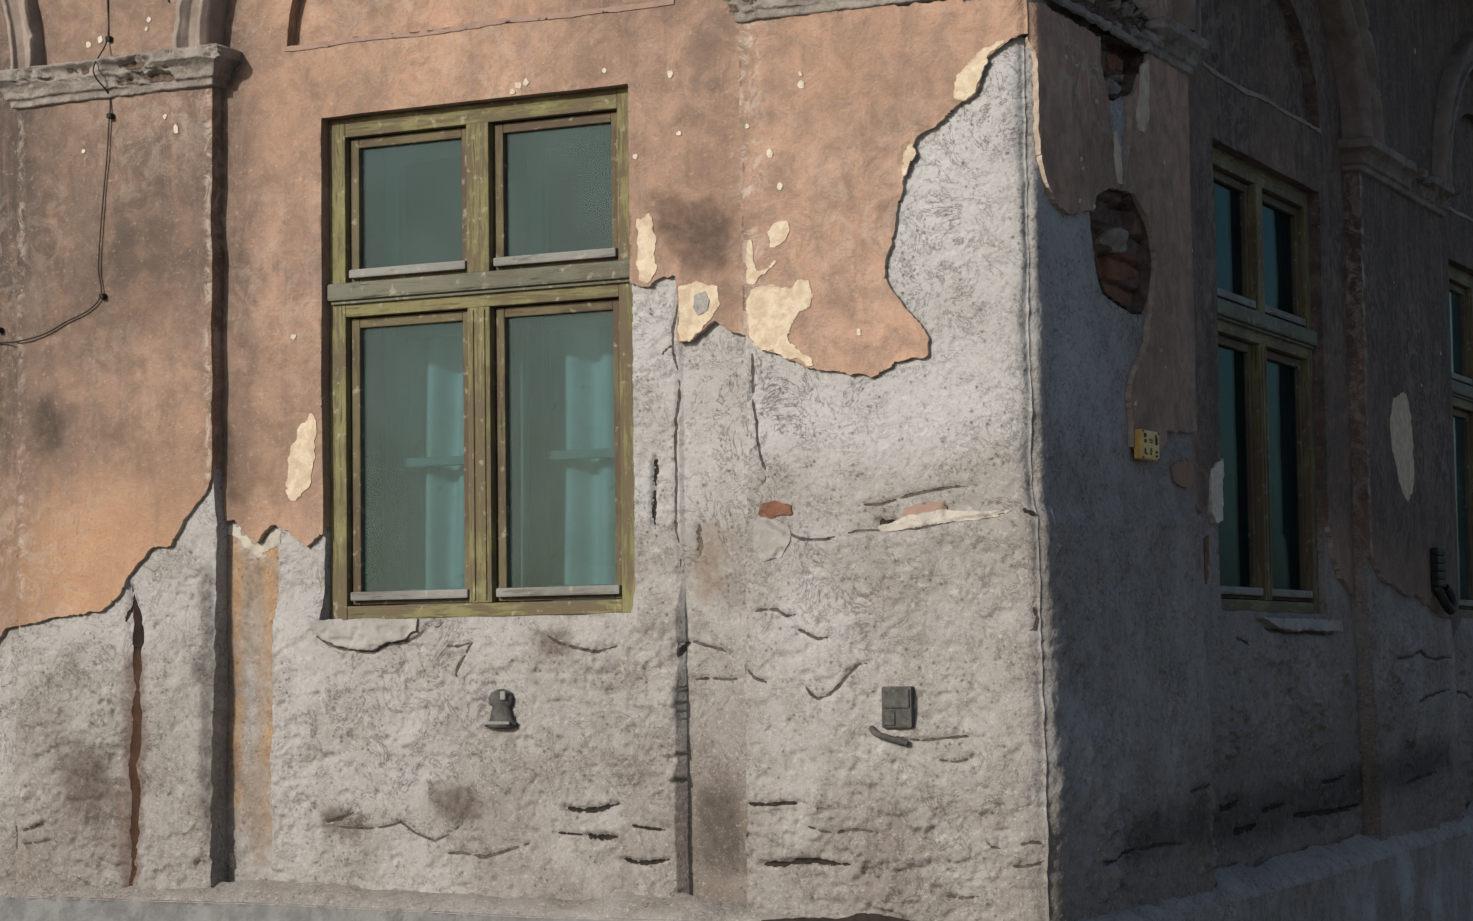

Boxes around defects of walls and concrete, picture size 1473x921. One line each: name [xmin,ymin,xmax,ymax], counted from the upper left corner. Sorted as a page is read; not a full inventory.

flaking render [1027,0,1122,40]
peeling [636,213,657,283]
flaking render [0,276,749,902]
crack [662,301,681,567]
crack [751,353,766,484]
flaking render [744,35,1473,921]